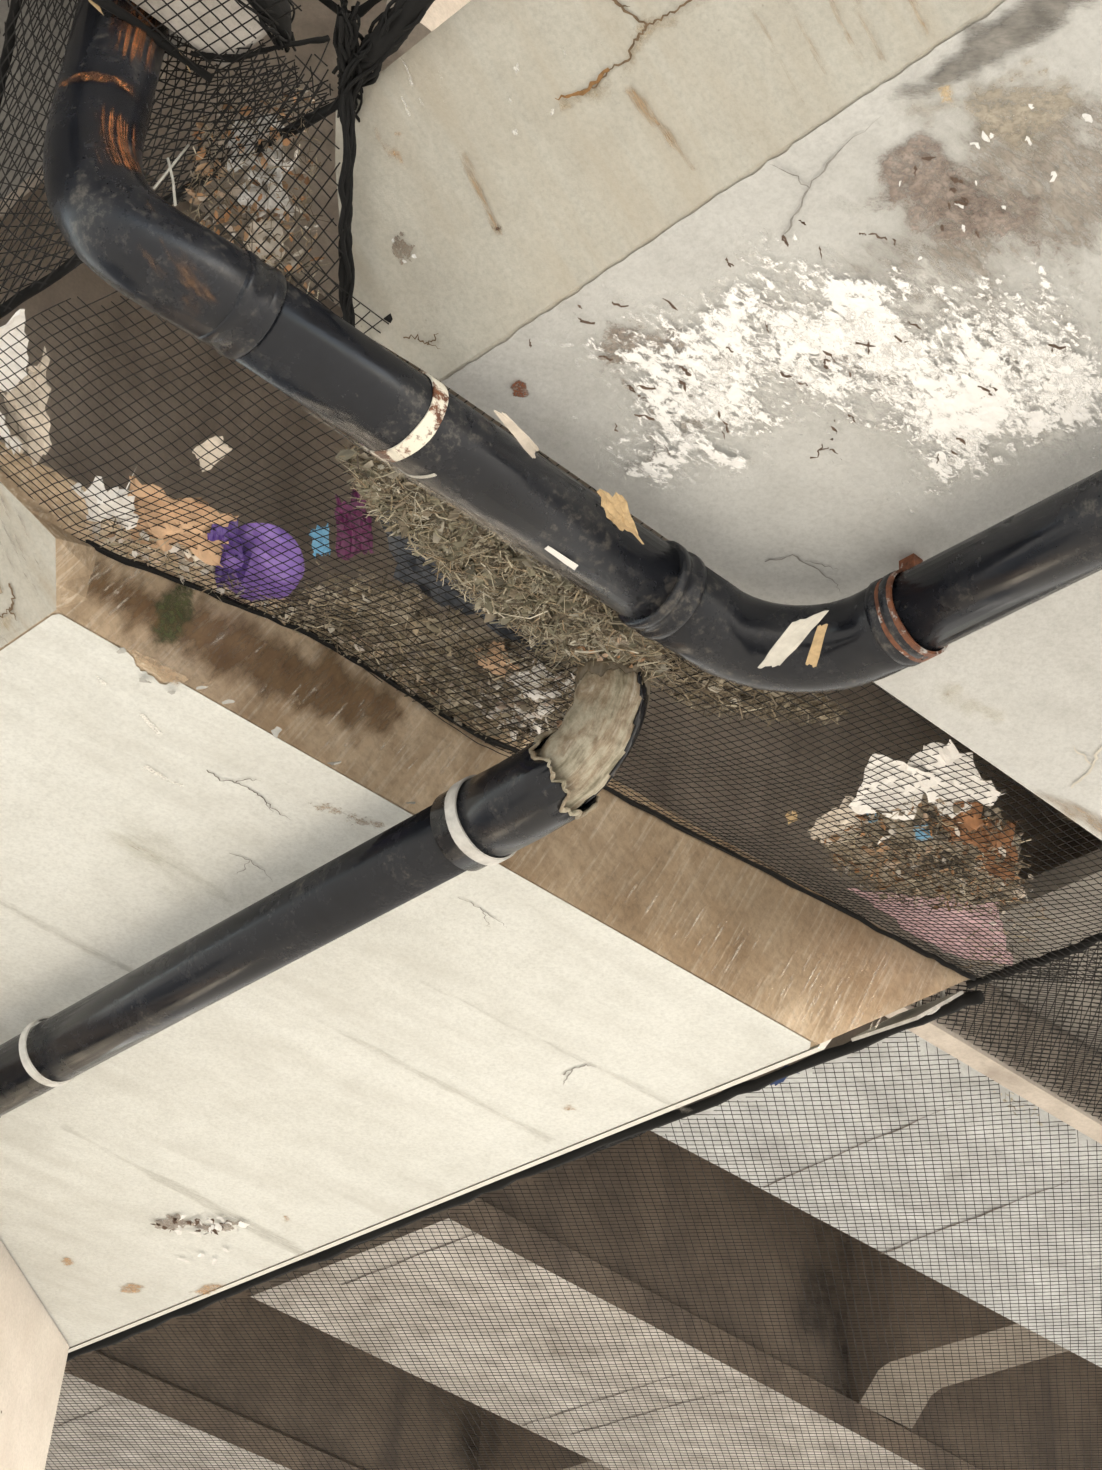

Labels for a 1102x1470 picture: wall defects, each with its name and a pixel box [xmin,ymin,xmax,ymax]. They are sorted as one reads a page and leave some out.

crack [555,0,692,100]
rust [628,90,675,146]
crack [770,117,880,234]
leakage [884,0,1102,325]
peeling [152,1214,250,1265]